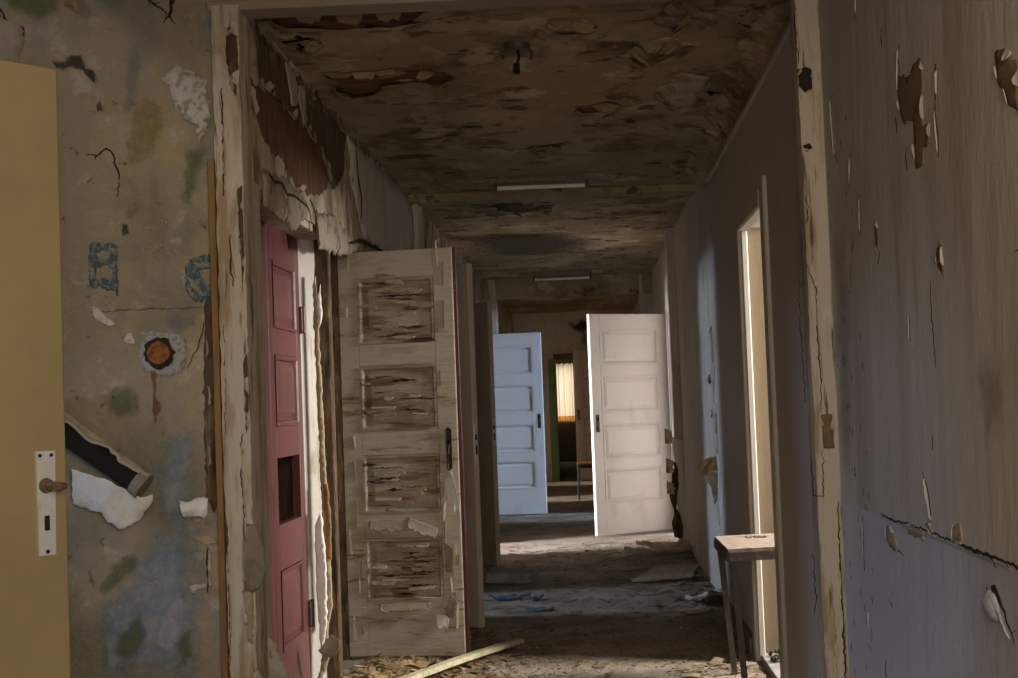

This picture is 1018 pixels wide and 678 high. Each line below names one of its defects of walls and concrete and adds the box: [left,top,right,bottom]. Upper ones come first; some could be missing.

crack [148,0,175,24]
peeling [162,65,212,142]
peeling [225,20,240,95]
peeling [251,11,455,197]
peeling [621,38,697,74]
peeling [653,73,716,111]
peeling [896,58,931,169]
peeling [994,47,1018,111]
crack [87,148,121,197]
crack [810,450,1018,678]